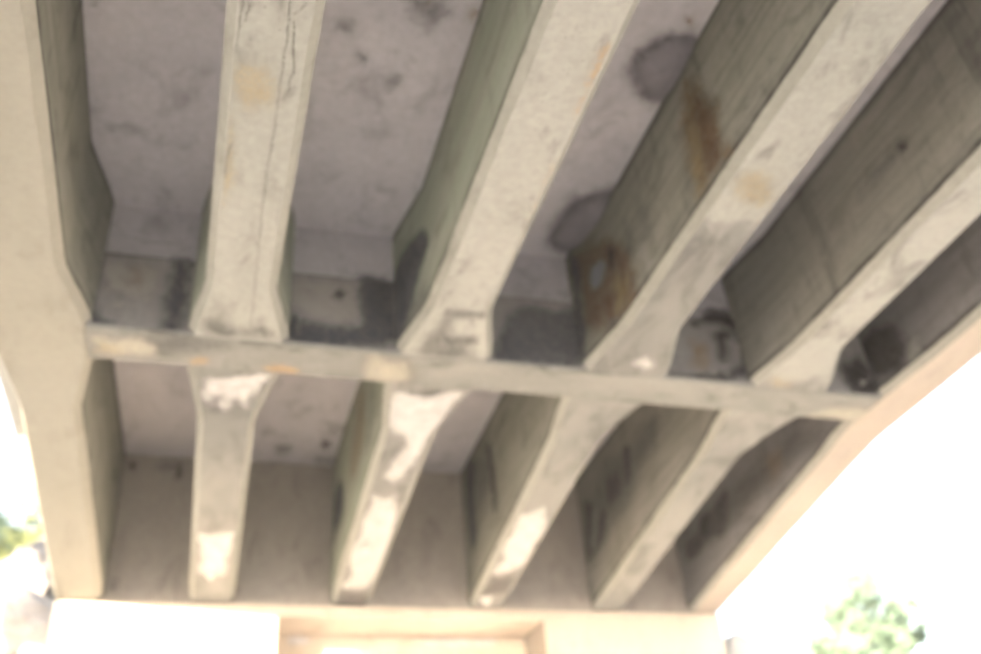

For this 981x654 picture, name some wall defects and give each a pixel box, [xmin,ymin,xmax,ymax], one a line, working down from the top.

crack [249,1,308,329]
damp [85,225,582,549]